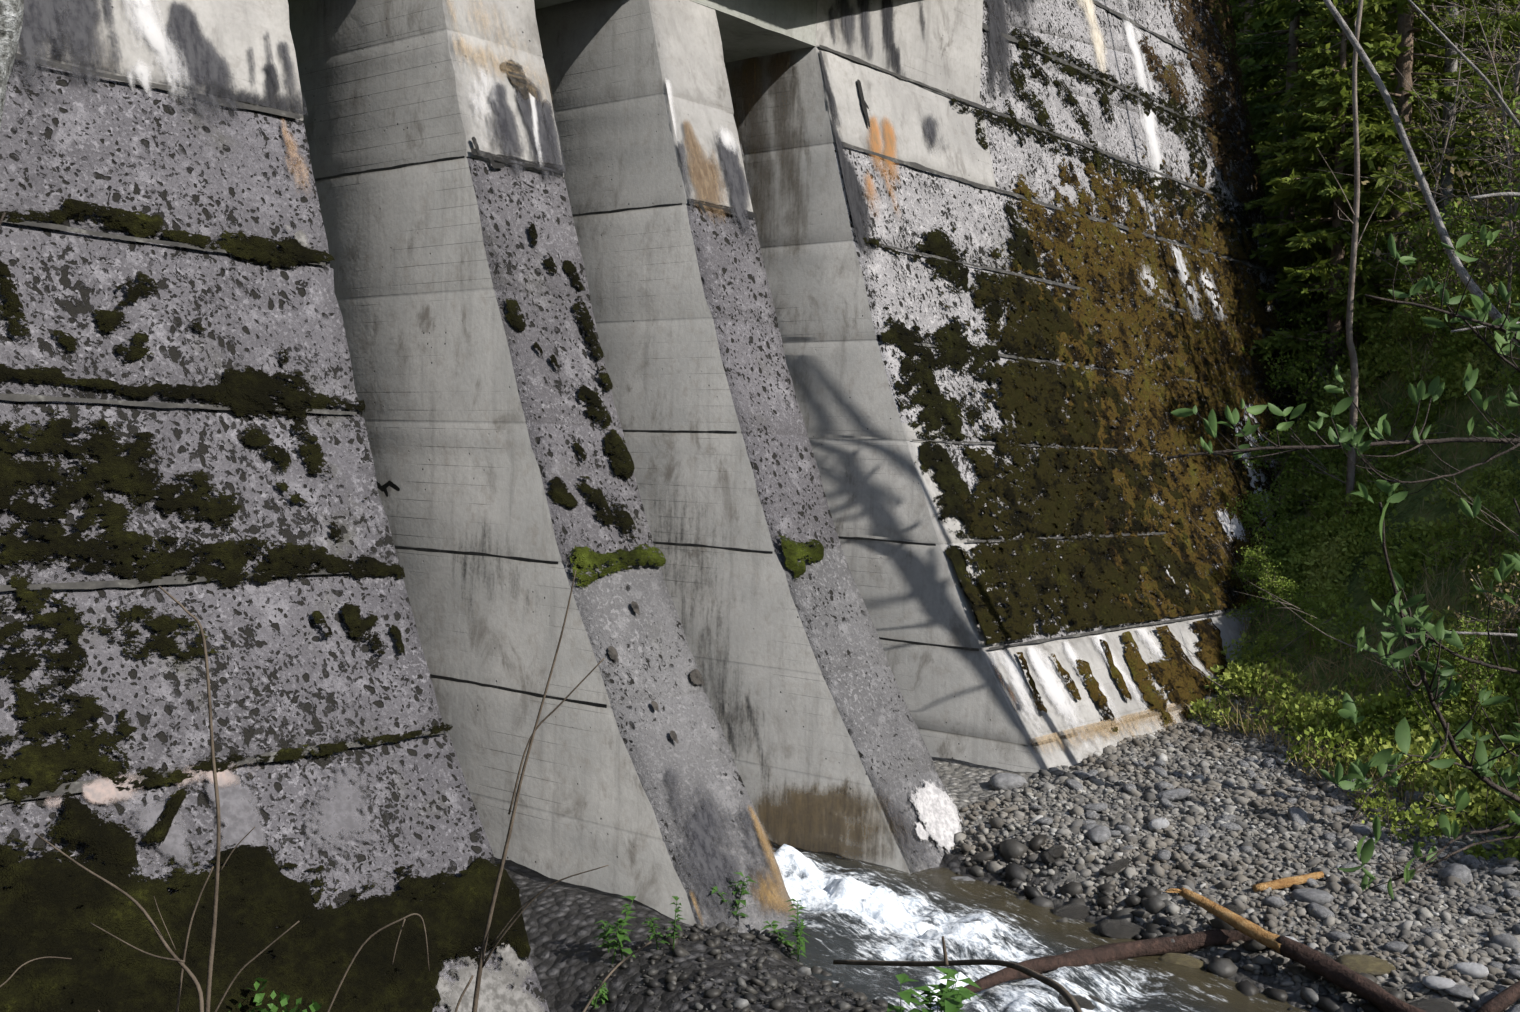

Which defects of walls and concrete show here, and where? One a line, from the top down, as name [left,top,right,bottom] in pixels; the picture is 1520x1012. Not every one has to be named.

damp [11,0,308,116]
damp [986,0,1034,96]
damp [819,0,906,260]
rust [866,117,896,199]
damp [923,116,937,146]
damp [667,768,933,927]